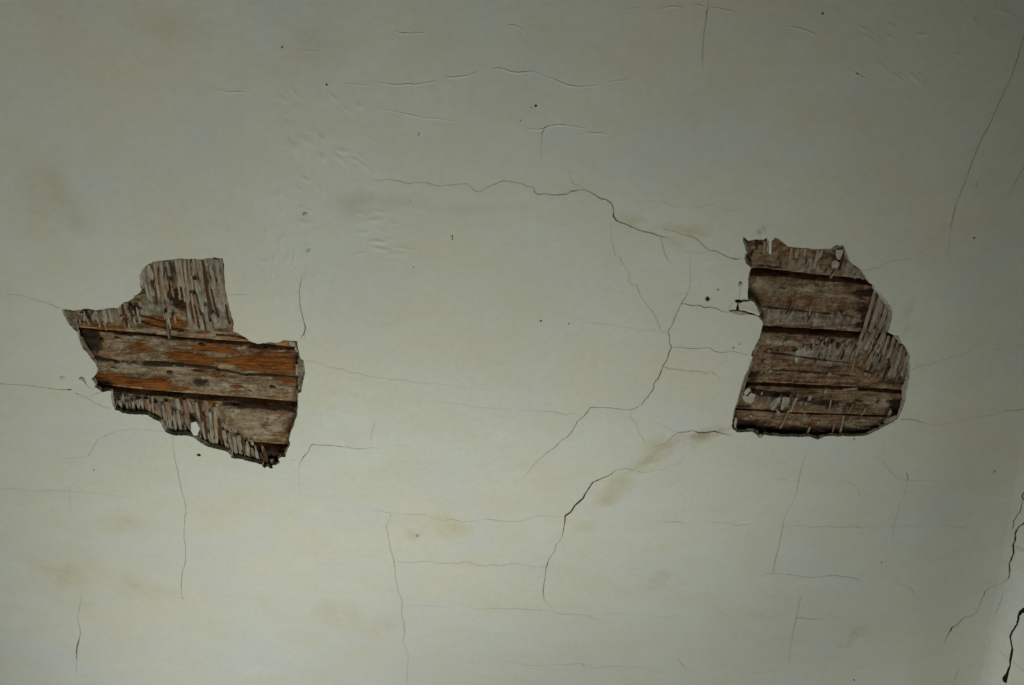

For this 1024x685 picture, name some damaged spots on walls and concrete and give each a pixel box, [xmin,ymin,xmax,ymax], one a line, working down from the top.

crack [538,190,662,237]
spalling [62,309,305,469]
crack [644,303,719,401]
spalling [730,237,910,440]
crack [563,475,609,531]
crack [984,492,1024,594]
crack [1002,608,1024,683]